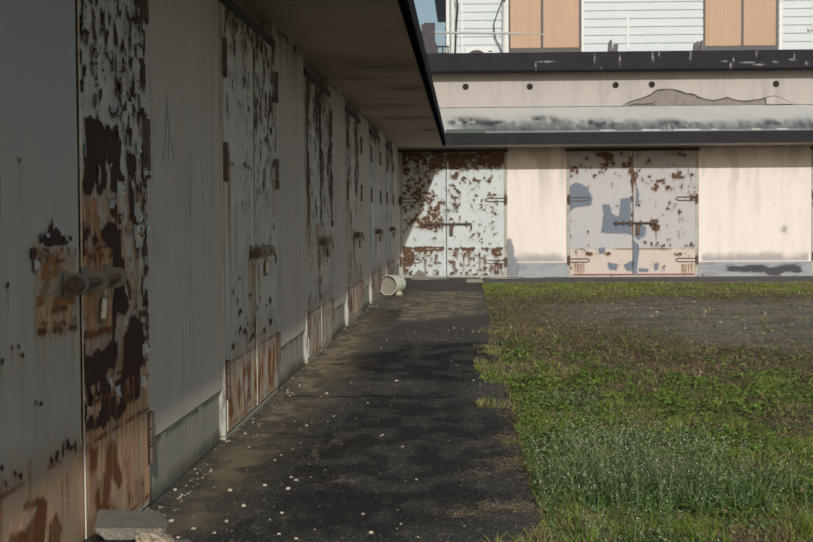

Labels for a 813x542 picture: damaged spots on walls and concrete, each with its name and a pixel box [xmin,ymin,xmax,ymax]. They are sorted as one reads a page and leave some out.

water stain [451,117,700,131]
peeling [31,217,72,274]
peeling [79,0,151,433]
peeling [570,151,695,226]
peeling [644,201,694,256]
rust [0,190,150,542]
rust [228,334,277,430]
crack [272,393,451,401]
peeling [50,438,87,464]